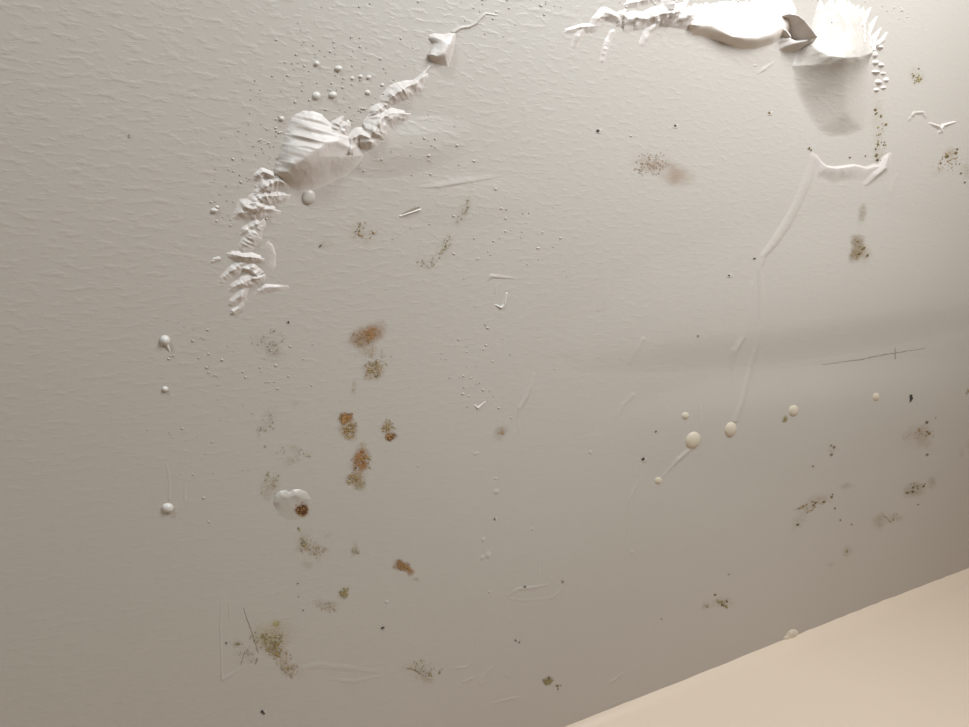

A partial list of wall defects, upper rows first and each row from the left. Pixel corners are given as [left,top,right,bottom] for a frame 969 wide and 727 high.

peeling [808,147,892,187]
corrosion [353,328,392,380]
corrosion [339,413,357,439]
corrosion [347,448,371,489]
corrosion [295,502,307,516]
water stain [237,622,298,677]